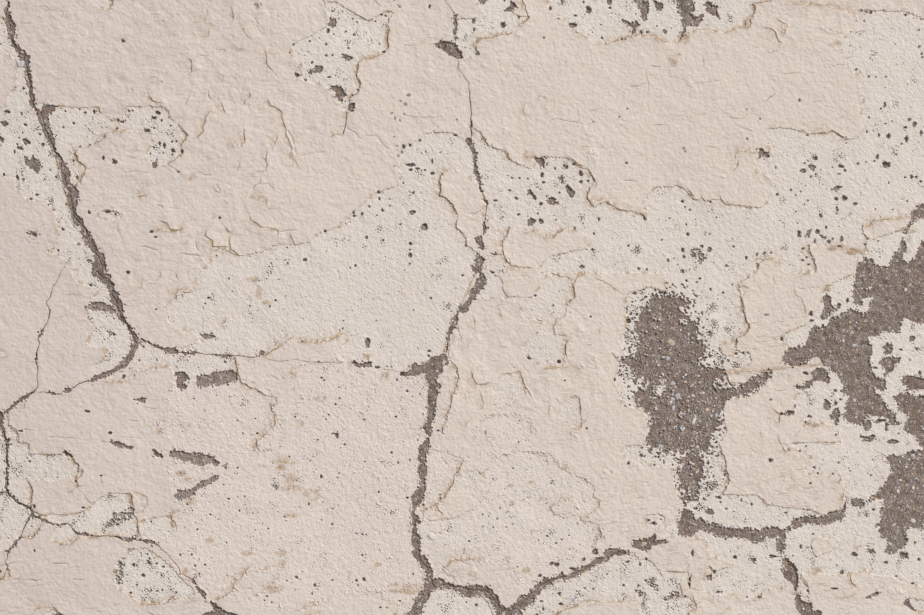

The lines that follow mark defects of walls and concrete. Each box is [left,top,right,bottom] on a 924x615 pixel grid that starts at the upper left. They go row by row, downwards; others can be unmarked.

peeling [266,0,393,119]
peeling [433,0,530,59]
peeling [547,0,771,46]
crack [0,0,342,613]
peeling [431,360,463,437]
spalling [108,431,133,450]
peeling [416,410,697,615]
peeling [901,598,924,613]